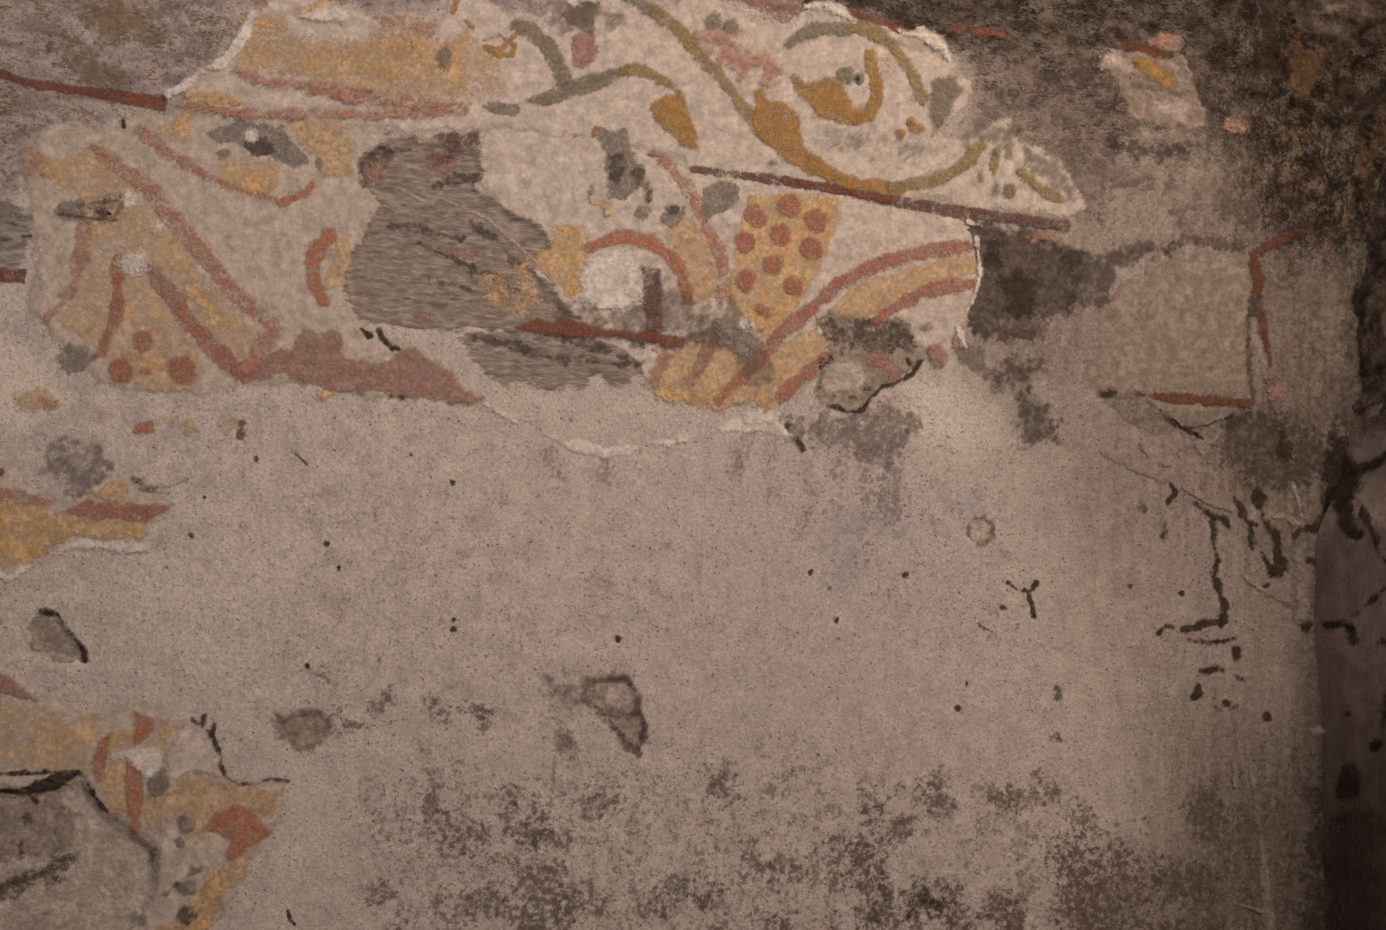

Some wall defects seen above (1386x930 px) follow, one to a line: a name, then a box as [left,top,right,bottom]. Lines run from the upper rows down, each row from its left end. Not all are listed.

spalling [815,310,929,411]
crack [1141,395,1233,438]
spalling [28,608,88,663]
crack [1156,482,1289,721]
crack [0,769,108,813]
crack [191,713,290,786]
spalling [547,673,649,757]
leakage [704,762,745,807]
leakage [419,767,606,930]
leakage [739,765,1221,930]
leakage [366,881,409,930]
leakage [639,872,728,930]